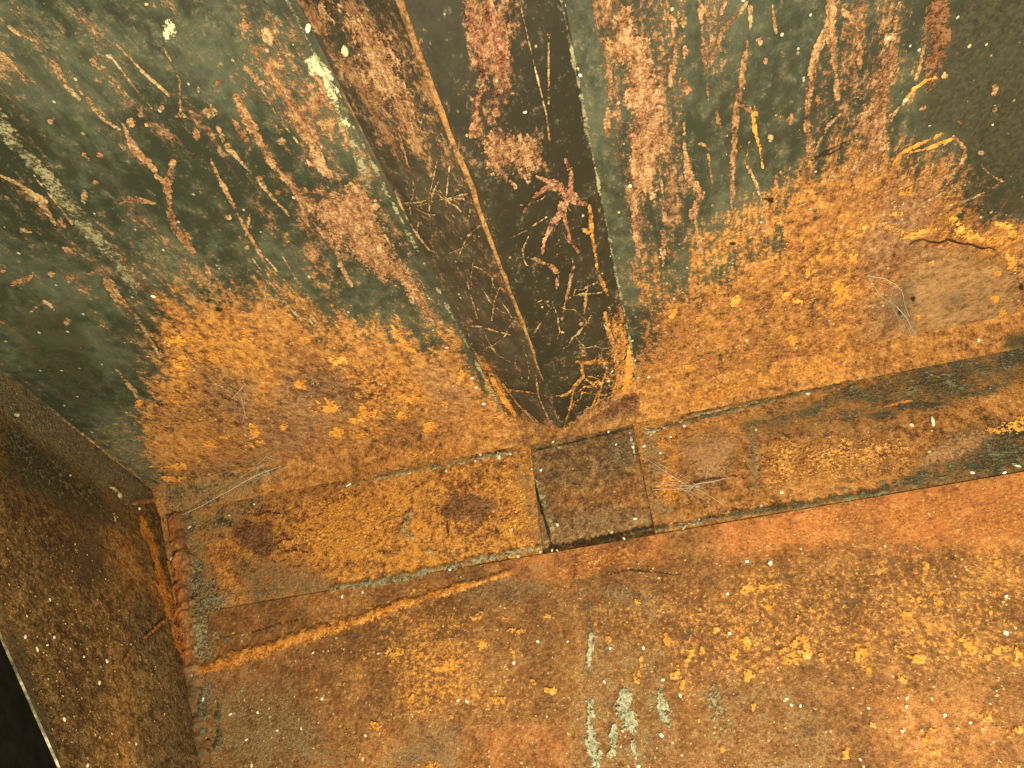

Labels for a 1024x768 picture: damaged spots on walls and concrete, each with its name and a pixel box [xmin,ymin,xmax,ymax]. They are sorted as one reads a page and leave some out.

corrosion [202,0,444,345]
peeling [305,55,371,196]
corrosion [465,0,609,333]
peeling [593,0,667,267]
corrosion [682,122,713,258]
peeling [827,1,908,182]
corrosion [948,212,1020,278]
corrosion [309,397,380,440]
corrosion [558,312,634,427]
corrosion [132,498,183,657]
water stain [585,698,603,768]
water stain [615,688,638,736]